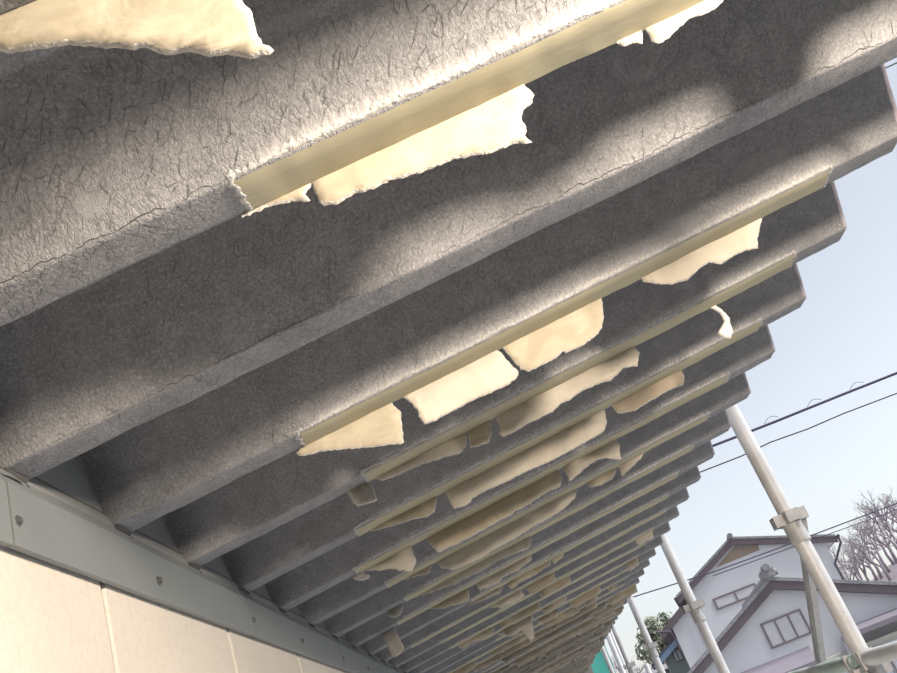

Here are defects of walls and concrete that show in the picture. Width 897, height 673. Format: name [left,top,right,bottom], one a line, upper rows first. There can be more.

peeling [0,0,274,59]
crack [0,0,896,449]
peeling [226,0,723,218]
peeling [293,164,834,673]